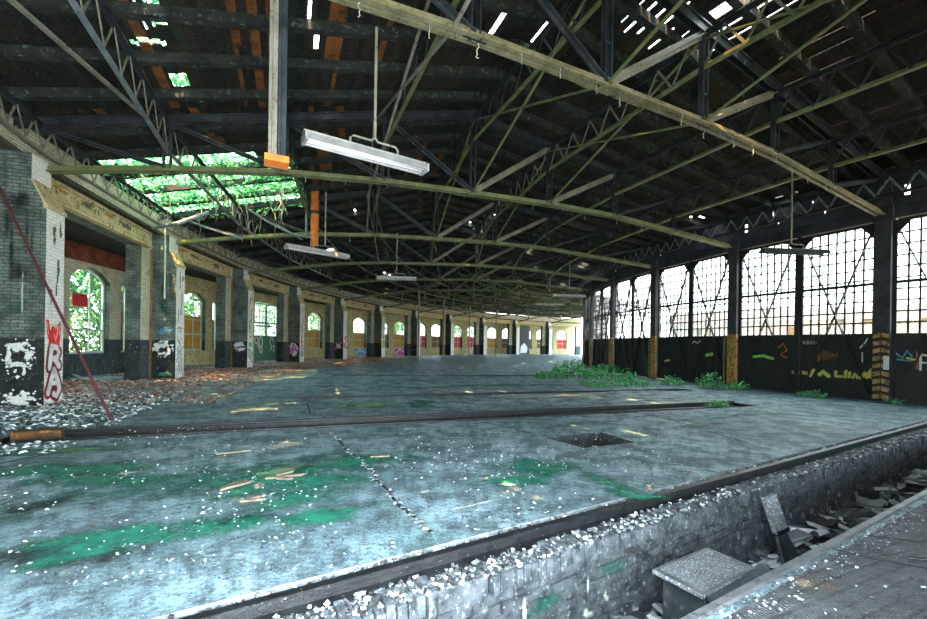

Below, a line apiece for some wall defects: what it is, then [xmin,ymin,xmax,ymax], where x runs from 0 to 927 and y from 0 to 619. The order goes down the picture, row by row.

peeling [0,338,41,406]
crack [176,484,292,506]
crack [329,430,433,532]